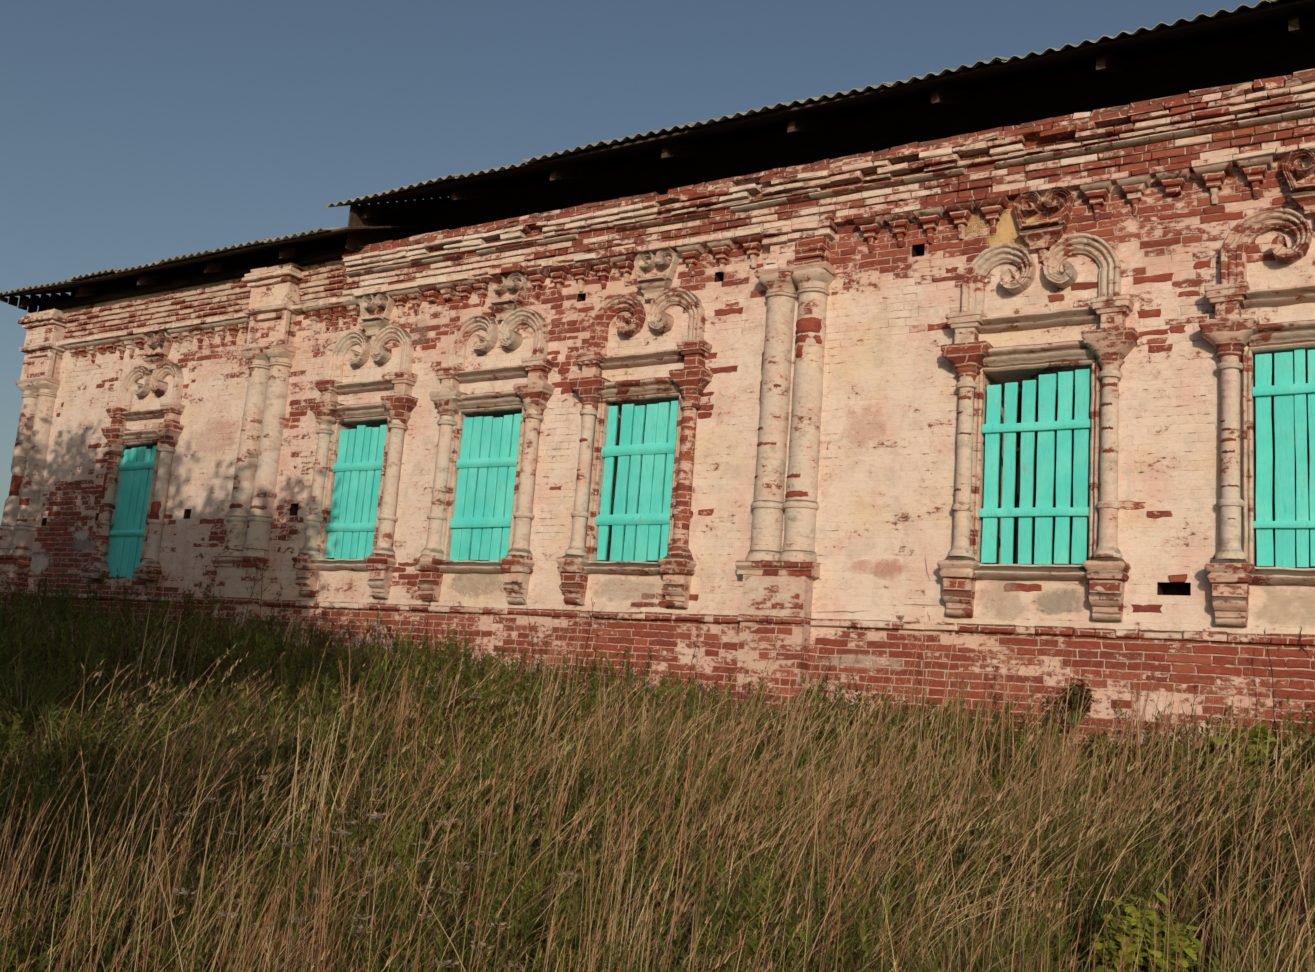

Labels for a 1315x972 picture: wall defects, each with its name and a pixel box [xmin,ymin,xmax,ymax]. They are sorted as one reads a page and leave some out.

peeling [1048,179,1289,237]
peeling [678,243,763,282]
peeling [912,231,994,282]
peeling [714,302,743,316]
peeling [1047,282,1098,302]
peeling [1133,273,1200,297]
spalling [795,317,822,358]
peeling [1137,309,1208,353]
peeling [9,443,108,573]
peeling [630,593,669,608]
spalling [1131,574,1191,613]
peeling [1124,643,1315,691]